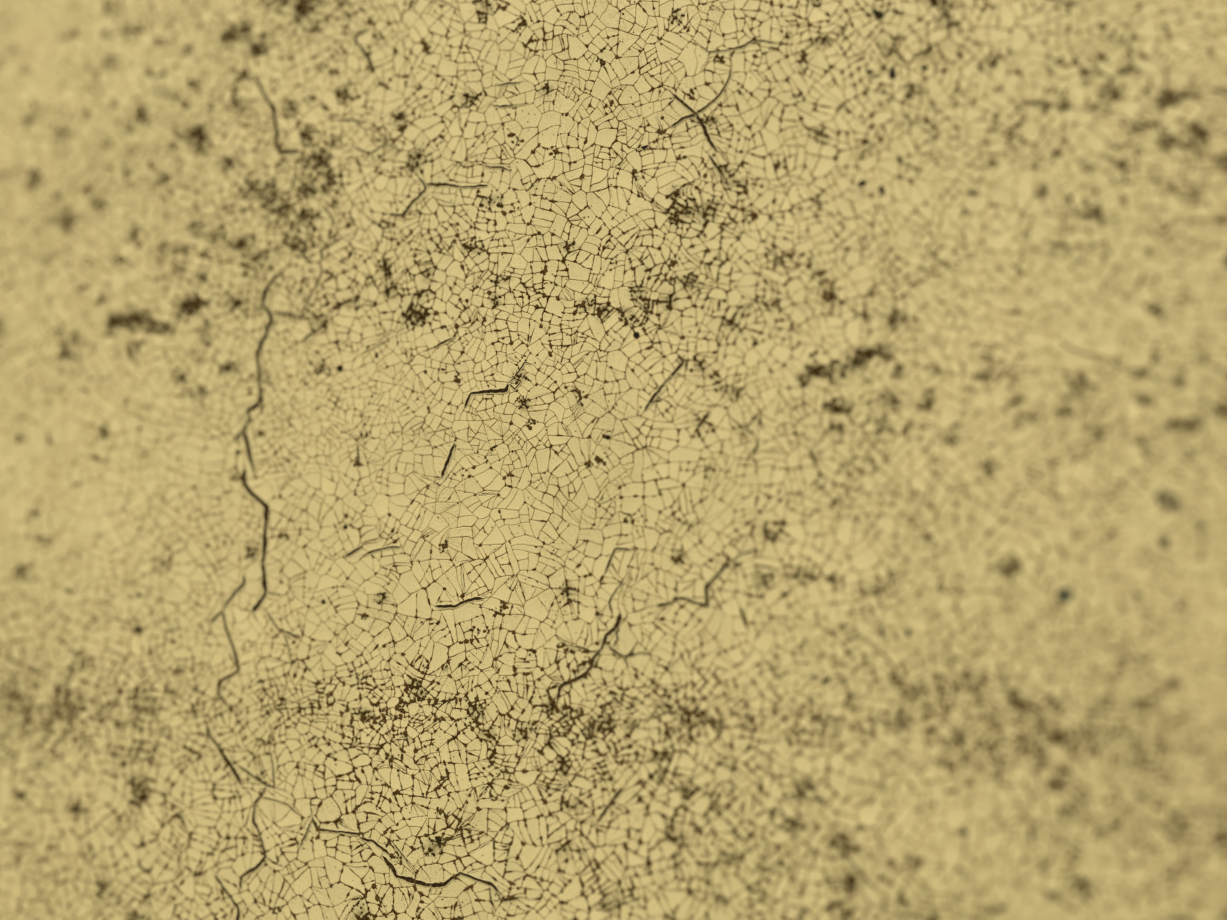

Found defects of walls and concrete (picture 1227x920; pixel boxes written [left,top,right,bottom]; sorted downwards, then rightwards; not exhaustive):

crack [243,48,301,189]
crack [463,361,531,408]
crack [205,204,519,920]
crack [554,546,637,701]
crack [656,549,754,608]
crack [739,607,749,628]